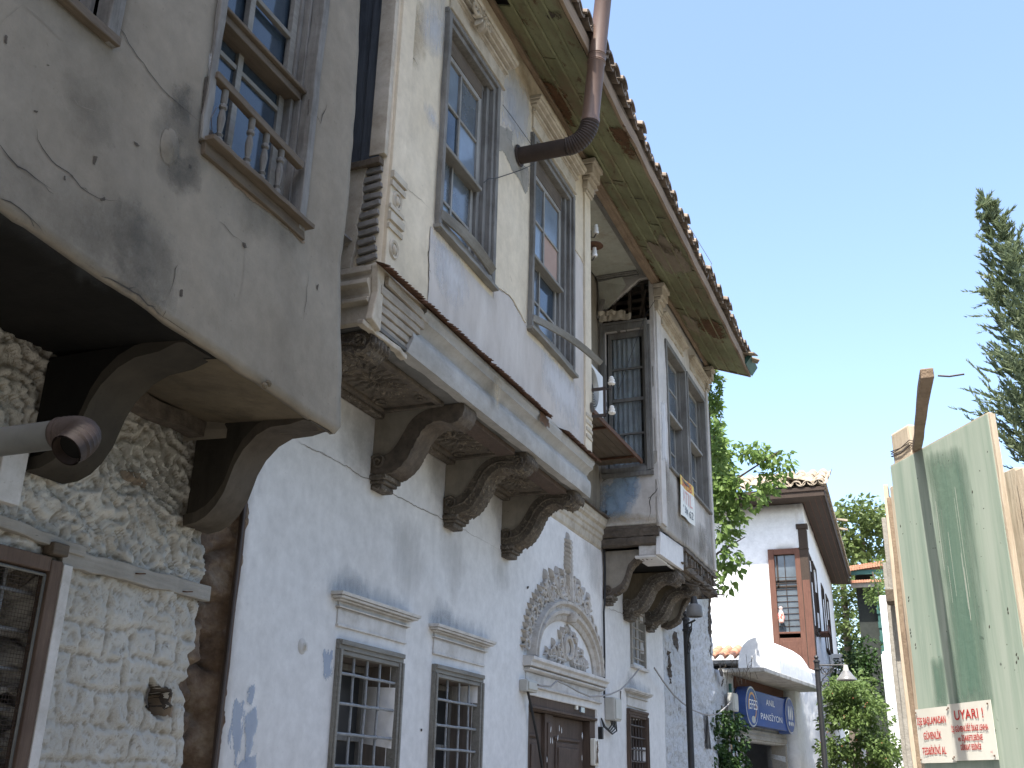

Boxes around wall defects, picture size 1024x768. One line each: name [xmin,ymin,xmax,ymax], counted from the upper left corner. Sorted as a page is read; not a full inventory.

crack [0,134,112,201]
crack [100,266,177,318]
peeling [228,684,258,768]